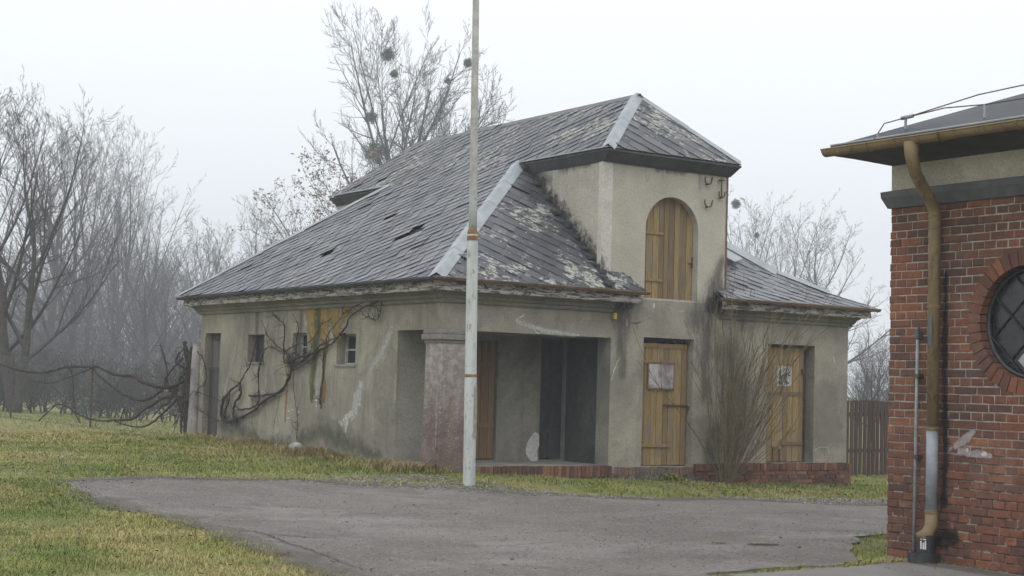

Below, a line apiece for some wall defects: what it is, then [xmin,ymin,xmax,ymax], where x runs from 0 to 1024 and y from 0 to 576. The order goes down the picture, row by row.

water stain [271,309,378,460]
peeling [338,325,393,434]
spalling [526,432,539,461]